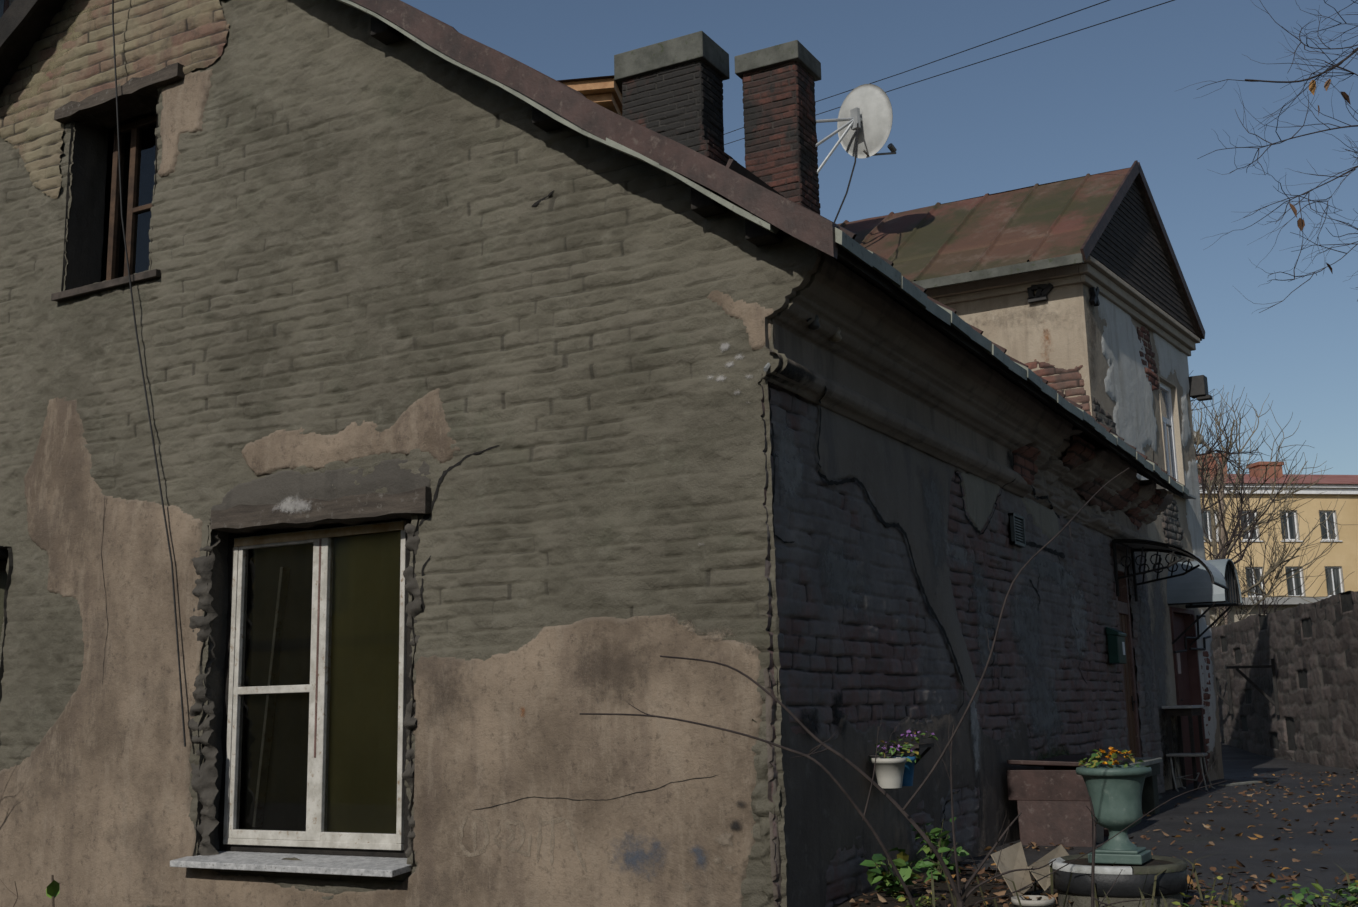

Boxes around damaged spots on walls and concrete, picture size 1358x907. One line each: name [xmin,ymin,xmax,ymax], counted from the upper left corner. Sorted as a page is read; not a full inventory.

peeling [0,0,229,199]
crack [769,382,995,713]
peeling [1025,294,1205,561]